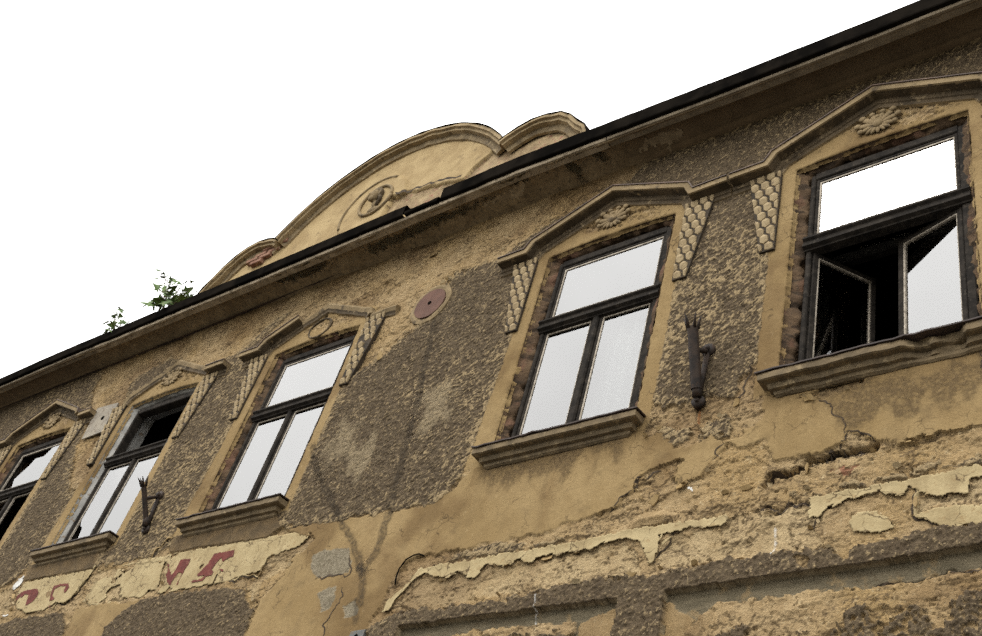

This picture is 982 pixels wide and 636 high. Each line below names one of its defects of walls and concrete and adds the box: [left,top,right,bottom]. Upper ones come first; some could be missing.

peeling [0,532,314,615]
crack [318,556,352,636]
flaking render [382,424,982,613]
crack [753,400,879,530]